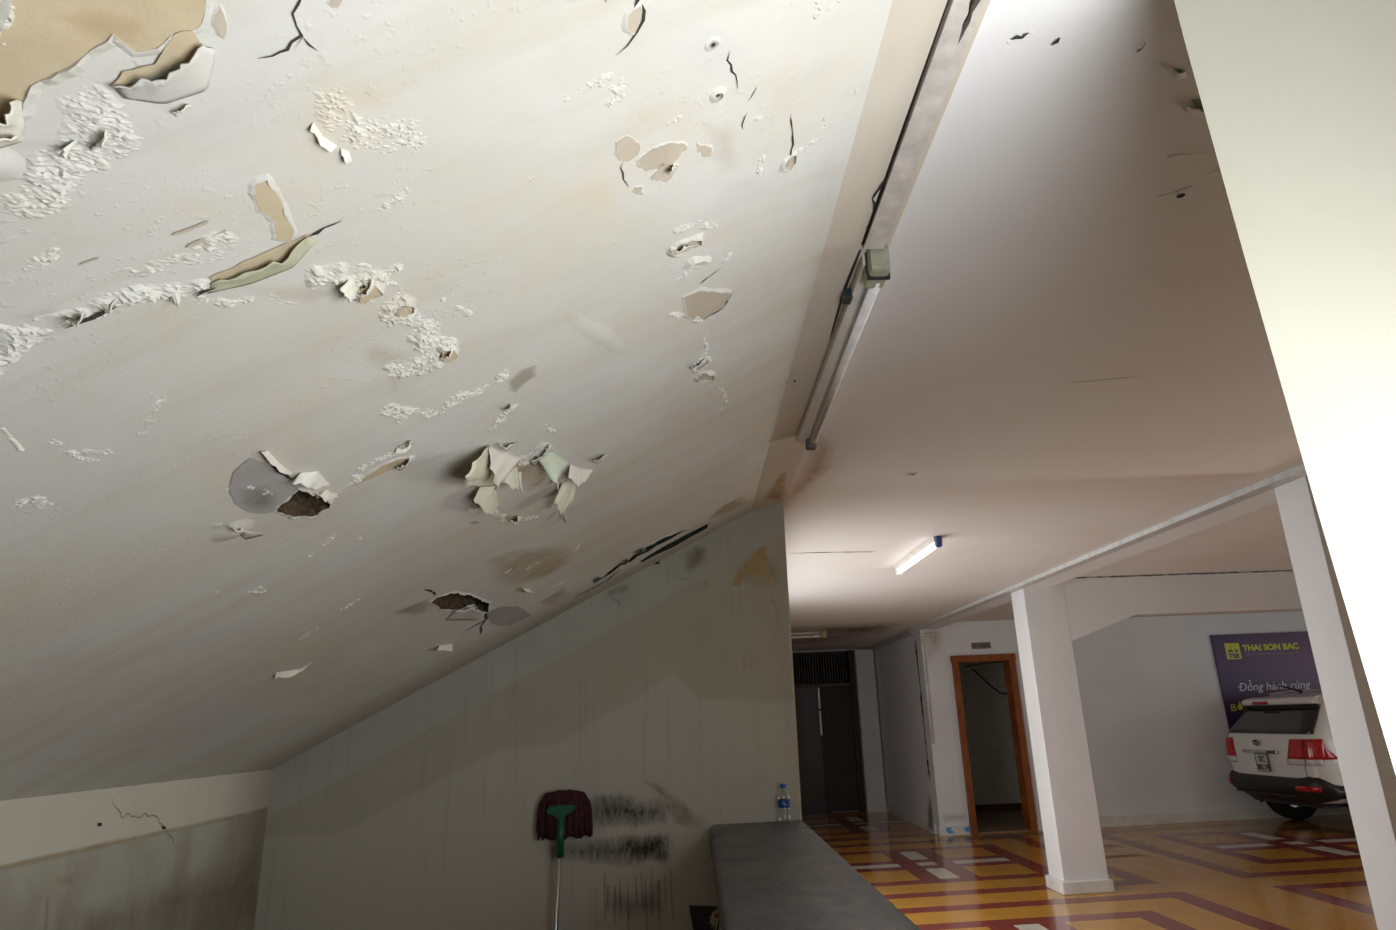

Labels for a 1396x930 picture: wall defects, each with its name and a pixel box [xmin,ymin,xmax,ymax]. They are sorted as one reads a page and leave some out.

peeling [0,0,229,219]
peeling [614,115,713,195]
peeling [0,173,460,380]
peeling [666,220,733,415]
peeling [376,369,509,424]
spalling [223,441,415,519]
peeling [462,404,607,525]
crack [580,524,708,595]
spalling [424,589,531,634]